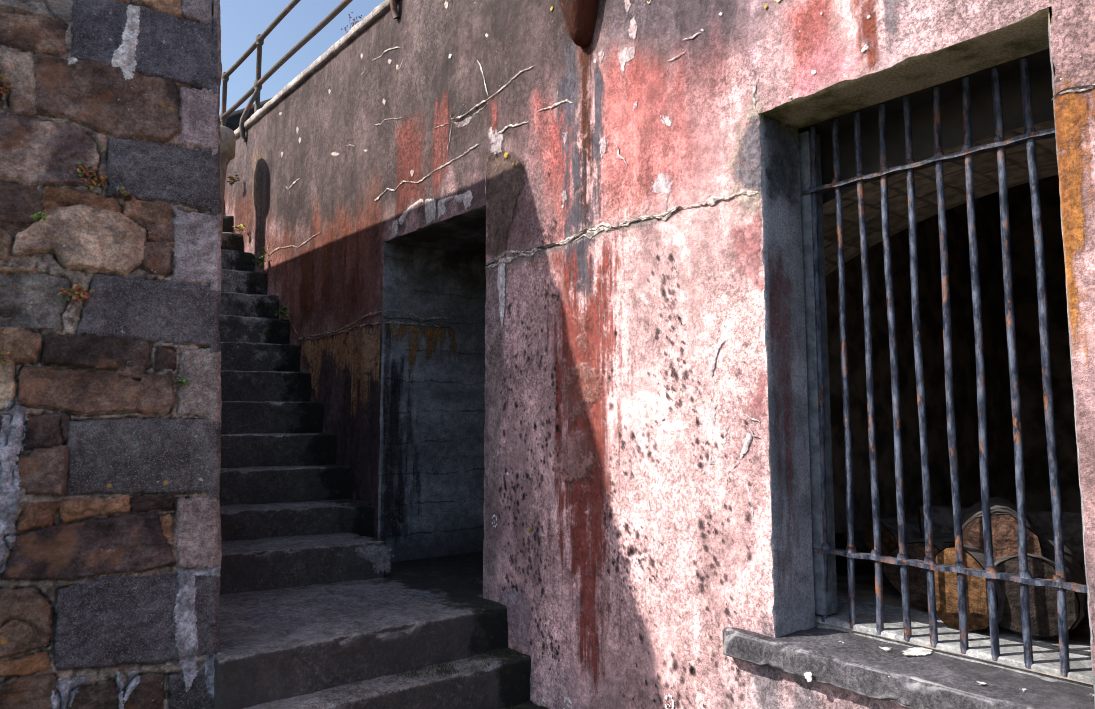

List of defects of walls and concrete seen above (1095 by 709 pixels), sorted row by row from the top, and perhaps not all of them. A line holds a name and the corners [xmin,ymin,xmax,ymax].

corrosion [433,101,448,194]
crack [375,60,572,201]
water stain [486,40,681,330]
crack [485,190,758,269]
water stain [618,0,637,72]
crack [1052,84,1095,100]
corrosion [1053,80,1095,355]
corrosion [299,222,457,416]
water stain [0,398,29,583]
corrosion [545,234,621,689]
water stain [116,670,142,709]
water stain [173,567,221,700]